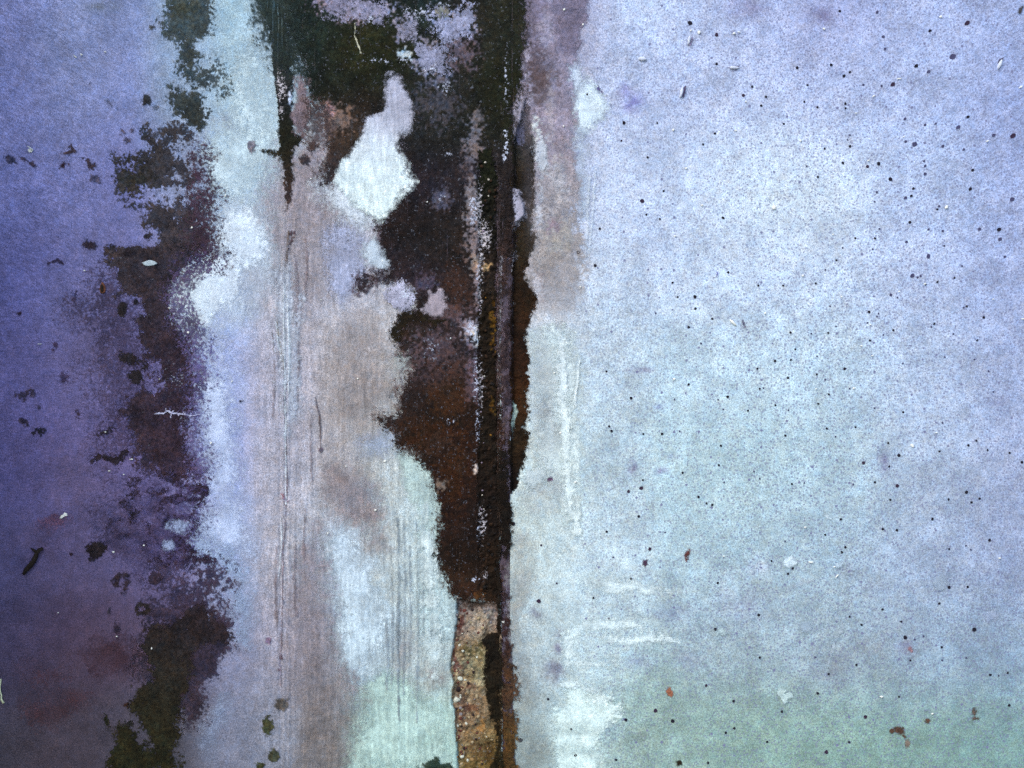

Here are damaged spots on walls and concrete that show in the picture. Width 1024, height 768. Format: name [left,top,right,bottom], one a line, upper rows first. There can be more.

water stain [53,0,242,768]
peeling [315,429,503,768]
water stain [246,0,590,768]